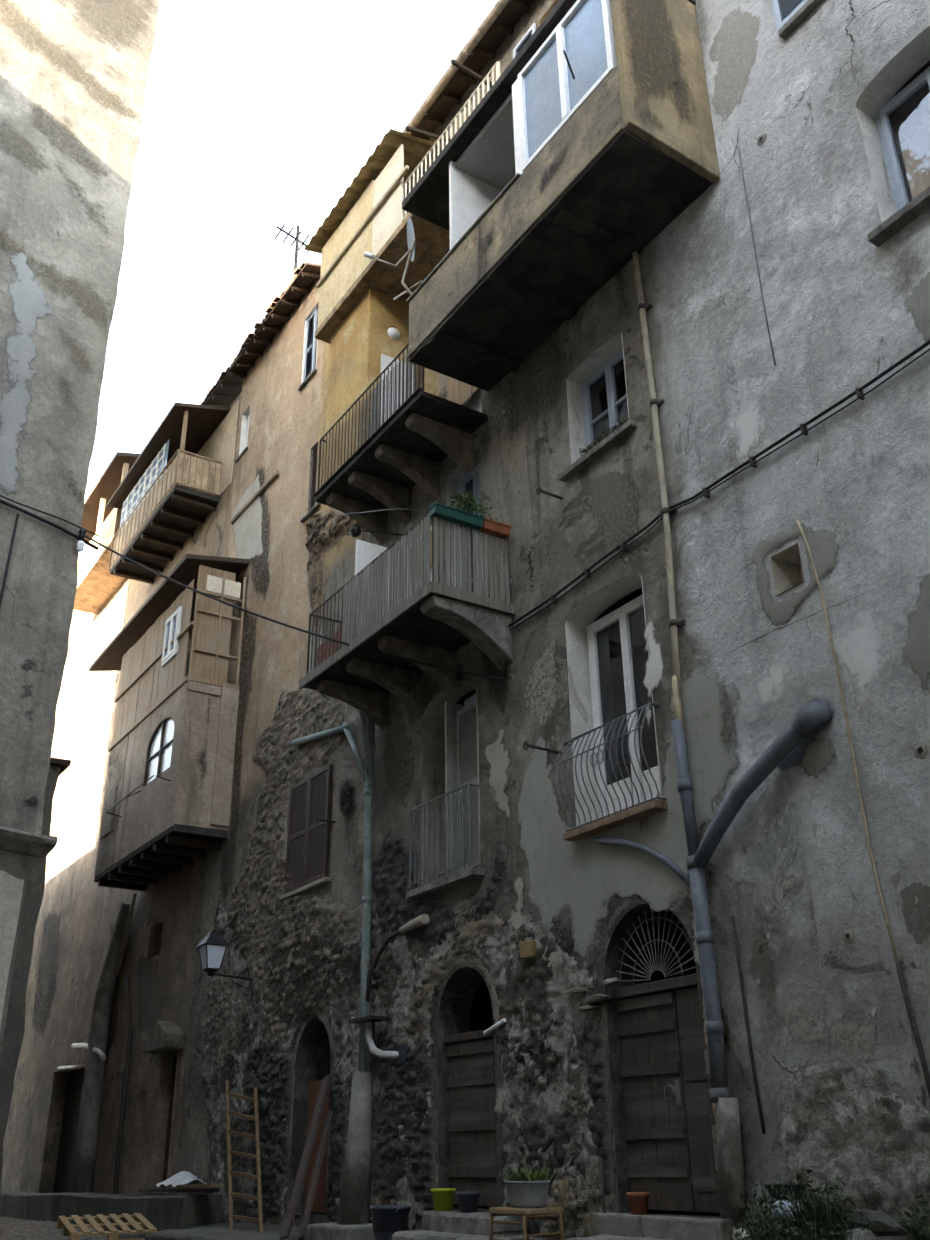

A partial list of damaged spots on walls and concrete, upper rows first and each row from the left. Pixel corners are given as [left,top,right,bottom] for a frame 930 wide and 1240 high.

water stain [623,0,695,130]
peeling [710,8,760,122]
crack [838,0,890,87]
spalling [339,777,357,822]
peeling [900,881,930,967]
spalling [201,894,640,1240]